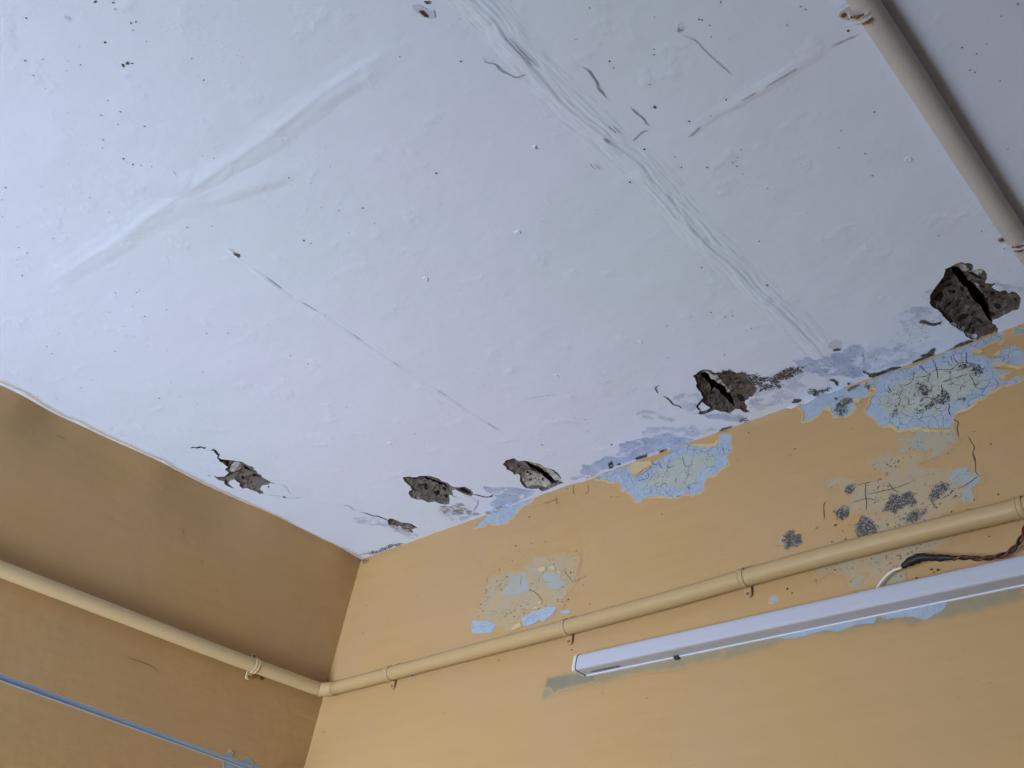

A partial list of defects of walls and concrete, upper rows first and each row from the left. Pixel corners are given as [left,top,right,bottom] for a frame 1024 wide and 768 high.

spalling [655,369,757,415]
peeling [796,262,1024,533]
spalling [191,446,301,498]
spalling [344,505,417,533]
spalling [403,458,563,529]
peeling [594,431,734,503]
damp [774,530,802,550]
damp [832,505,879,537]
damp [882,491,927,525]
peeling [469,541,584,638]